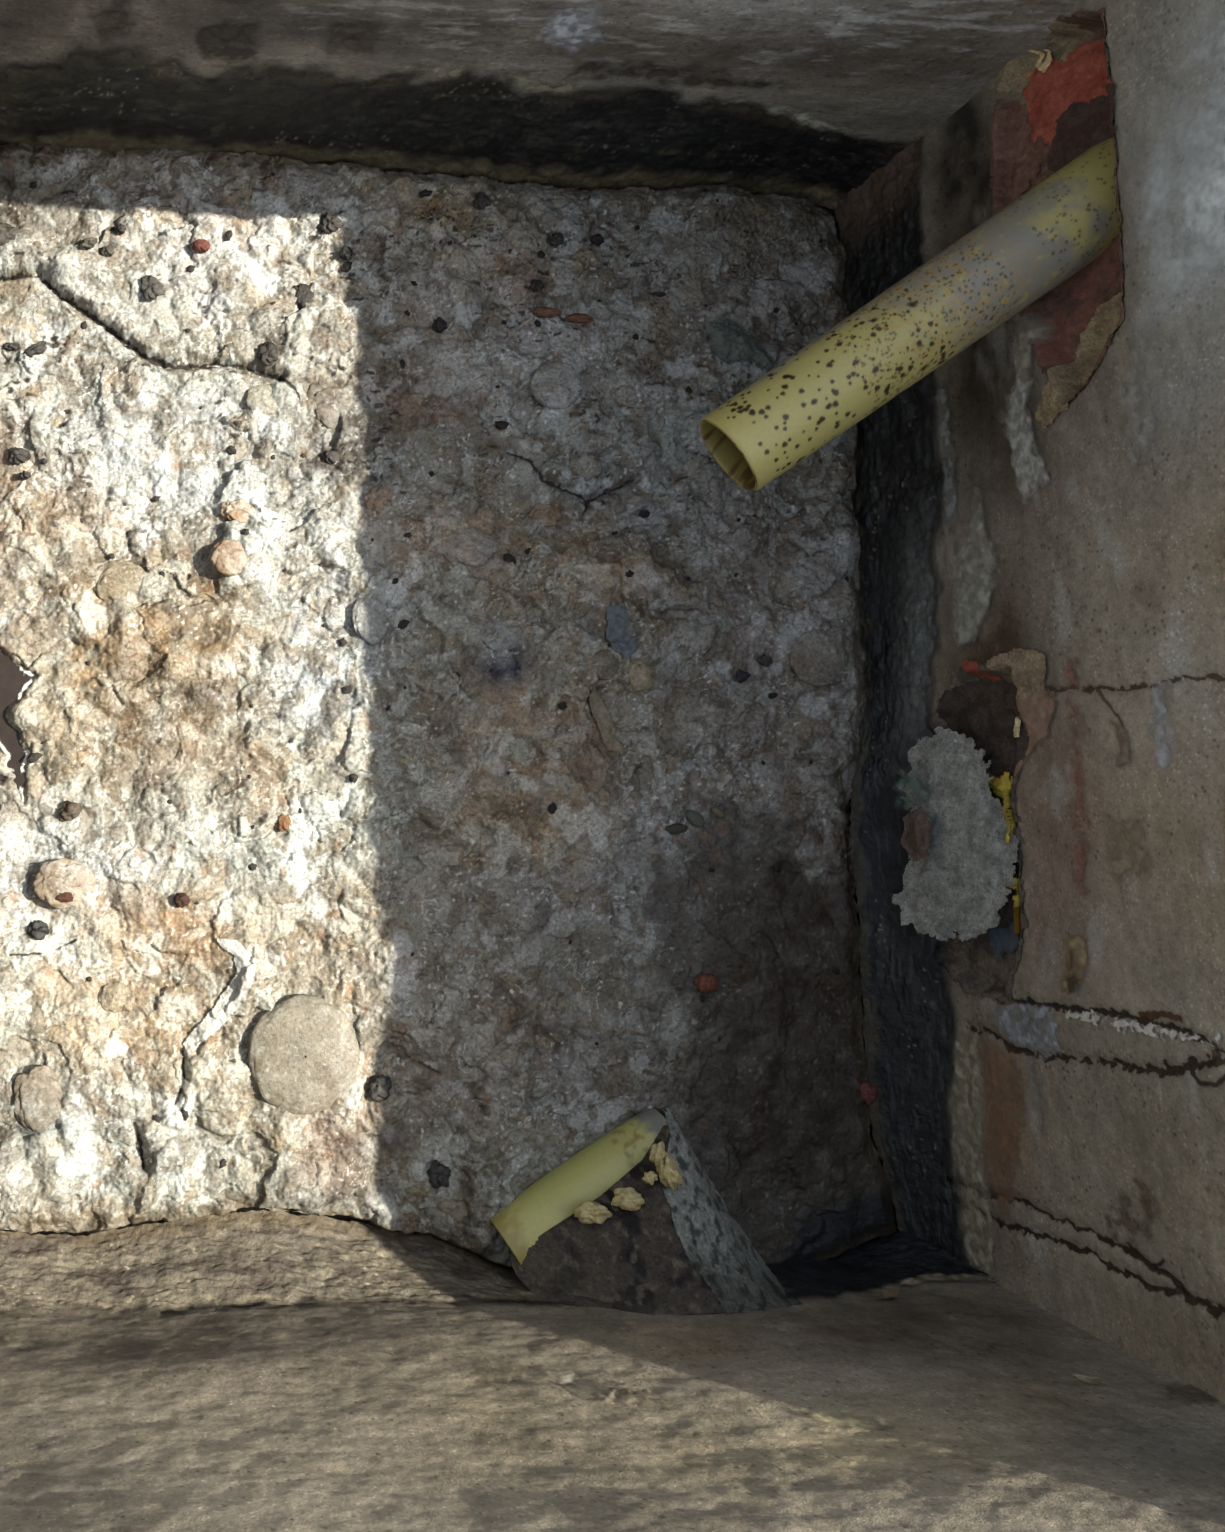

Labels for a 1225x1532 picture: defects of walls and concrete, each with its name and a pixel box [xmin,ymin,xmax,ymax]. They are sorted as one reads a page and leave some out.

spalling [990,6,1125,429]
crack [0,270,300,399]
crack [1045,673,1225,726]
peeling [901,807,931,862]
spalling [927,647,1055,1005]
crack [967,996,1225,1087]
crack [946,1177,1225,1320]